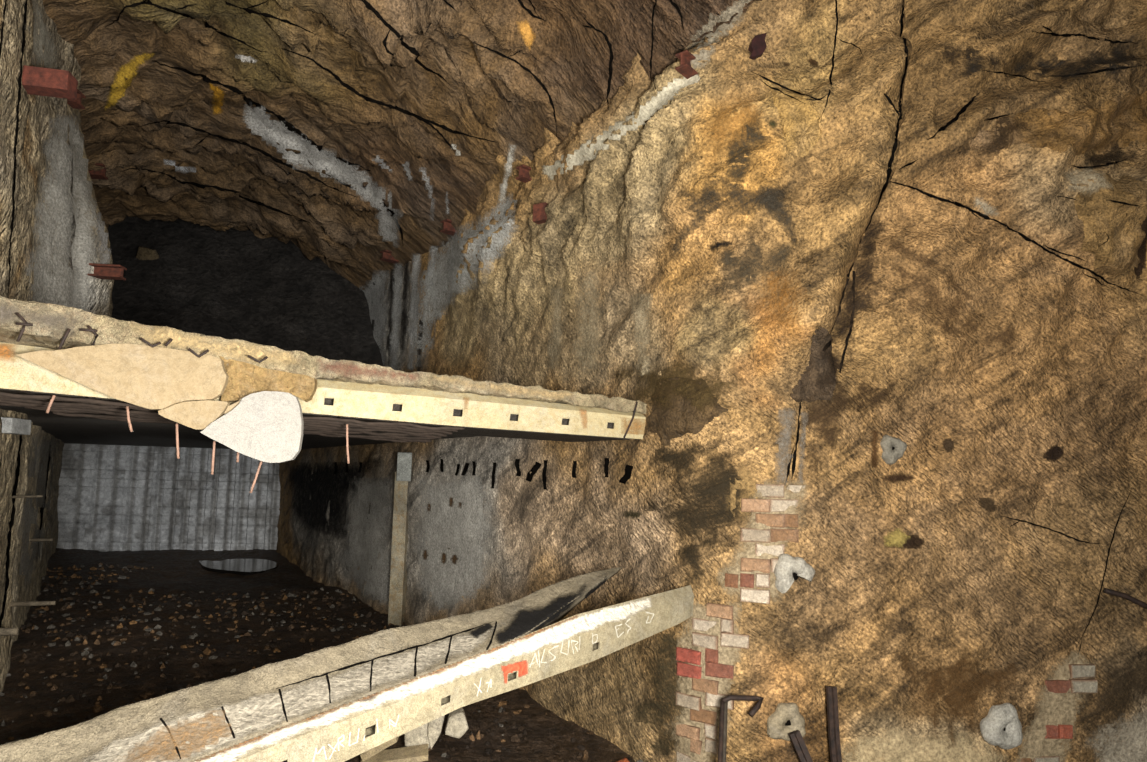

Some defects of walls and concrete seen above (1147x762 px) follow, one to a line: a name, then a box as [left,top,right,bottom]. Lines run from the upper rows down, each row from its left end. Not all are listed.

crack [752,0,863,123]
water stain [245,106,397,243]
water stain [375,155,449,214]
water stain [500,145,515,201]
crack [823,0,1142,373]
rust [0,345,13,359]
water stain [361,246,437,372]
water stain [616,294,726,411]
crack [785,401,802,485]
flaking render [672,470,805,762]
crack [999,488,1132,654]
flaking render [1019,652,1098,762]